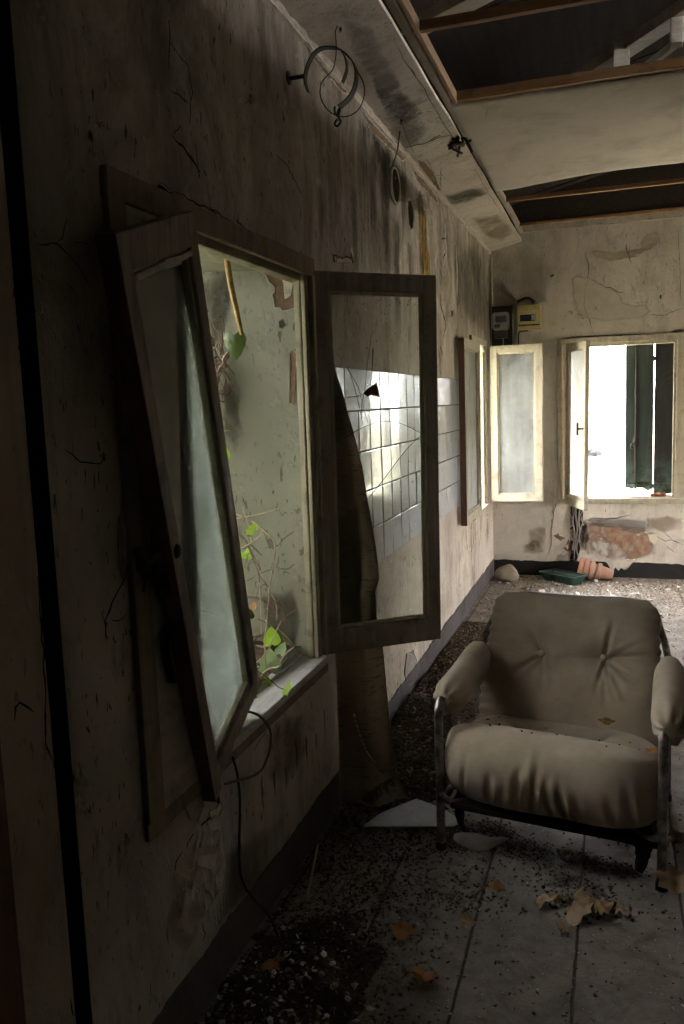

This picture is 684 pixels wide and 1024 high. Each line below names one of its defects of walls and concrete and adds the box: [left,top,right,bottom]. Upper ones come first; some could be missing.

crack [168,20,244,227]
leakage [351,27,419,144]
crack [570,228,684,338]
peeling [636,530,658,544]